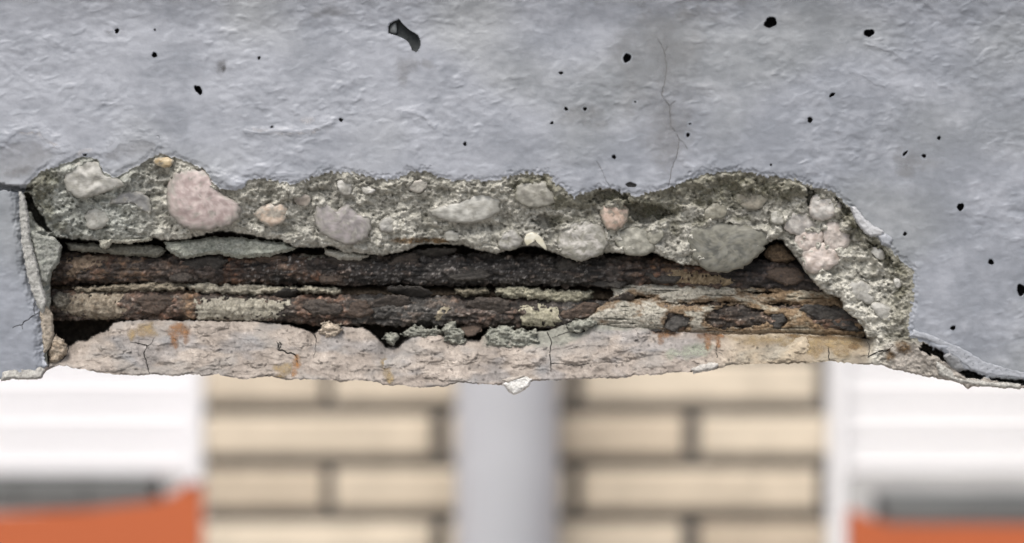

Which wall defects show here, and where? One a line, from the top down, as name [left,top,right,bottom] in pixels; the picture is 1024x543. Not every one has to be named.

crack [657,39,687,186]
crack [276,325,317,361]
spalling [1,154,1024,395]